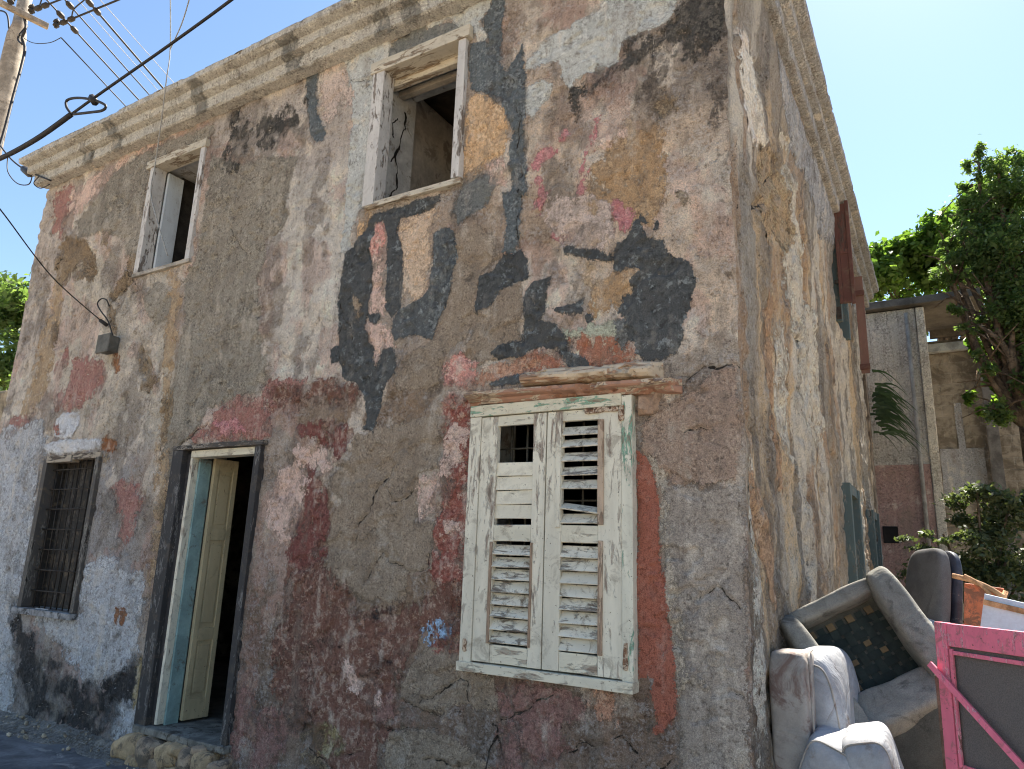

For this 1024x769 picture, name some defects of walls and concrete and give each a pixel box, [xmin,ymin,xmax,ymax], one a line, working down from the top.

crack [389,112,407,197]
crack [683,364,740,386]
spalling [101,435,117,463]
crack [356,478,413,539]
leakage [132,658,142,710]
crack [387,674,489,731]
crack [426,695,553,769]